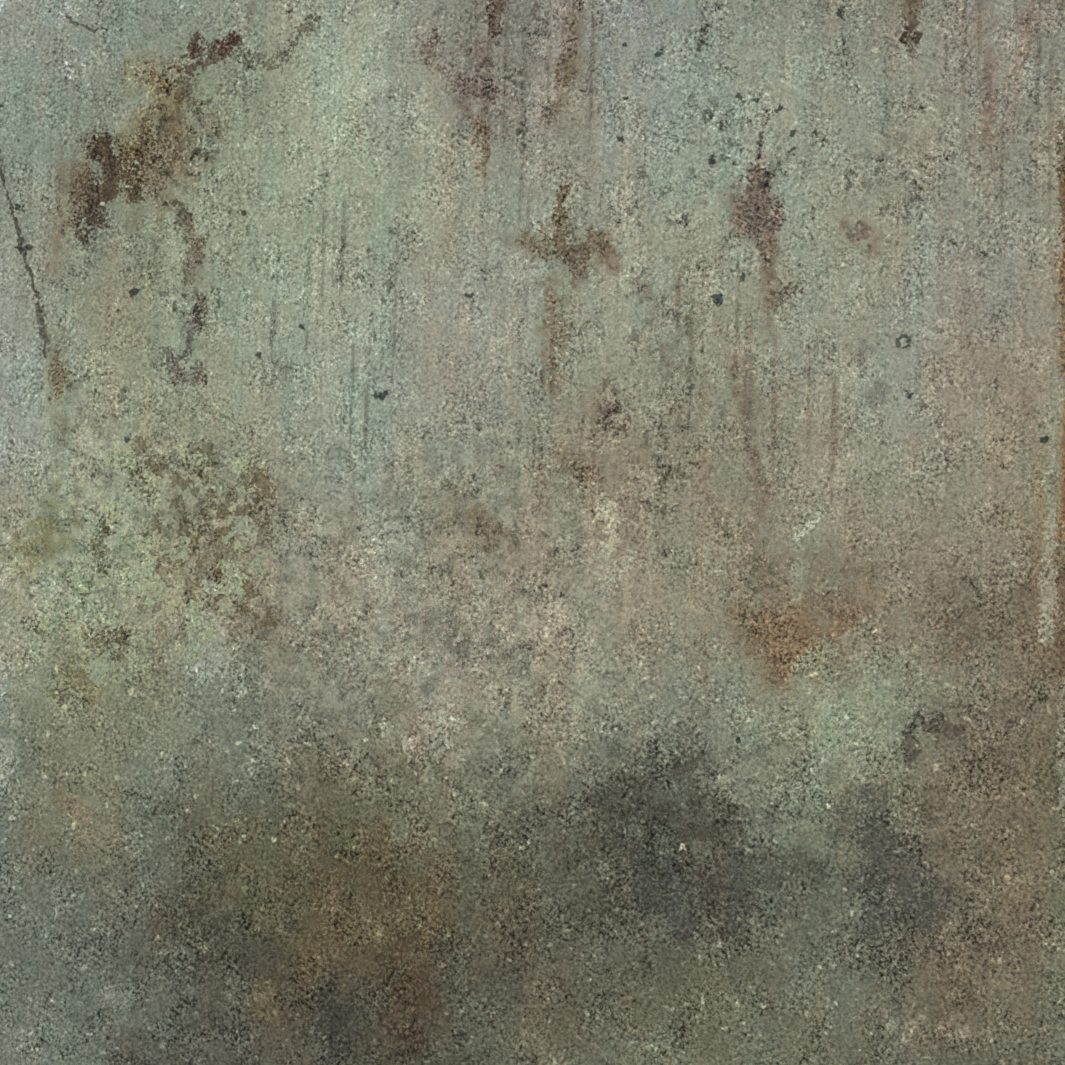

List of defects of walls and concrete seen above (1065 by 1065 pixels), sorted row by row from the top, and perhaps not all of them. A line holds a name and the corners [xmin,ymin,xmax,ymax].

crack [0,150,50,358]
corrosion [69,13,320,244]
corrosion [420,34,505,177]
corrosion [485,0,506,35]
corrosion [520,183,623,398]
corrosion [736,109,803,344]
corrosion [899,0,925,53]
corrosion [1055,116,1065,376]
leakage [573,738,825,950]
leakage [847,799,957,938]
leakage [901,711,966,769]
leakage [306,973,380,1065]